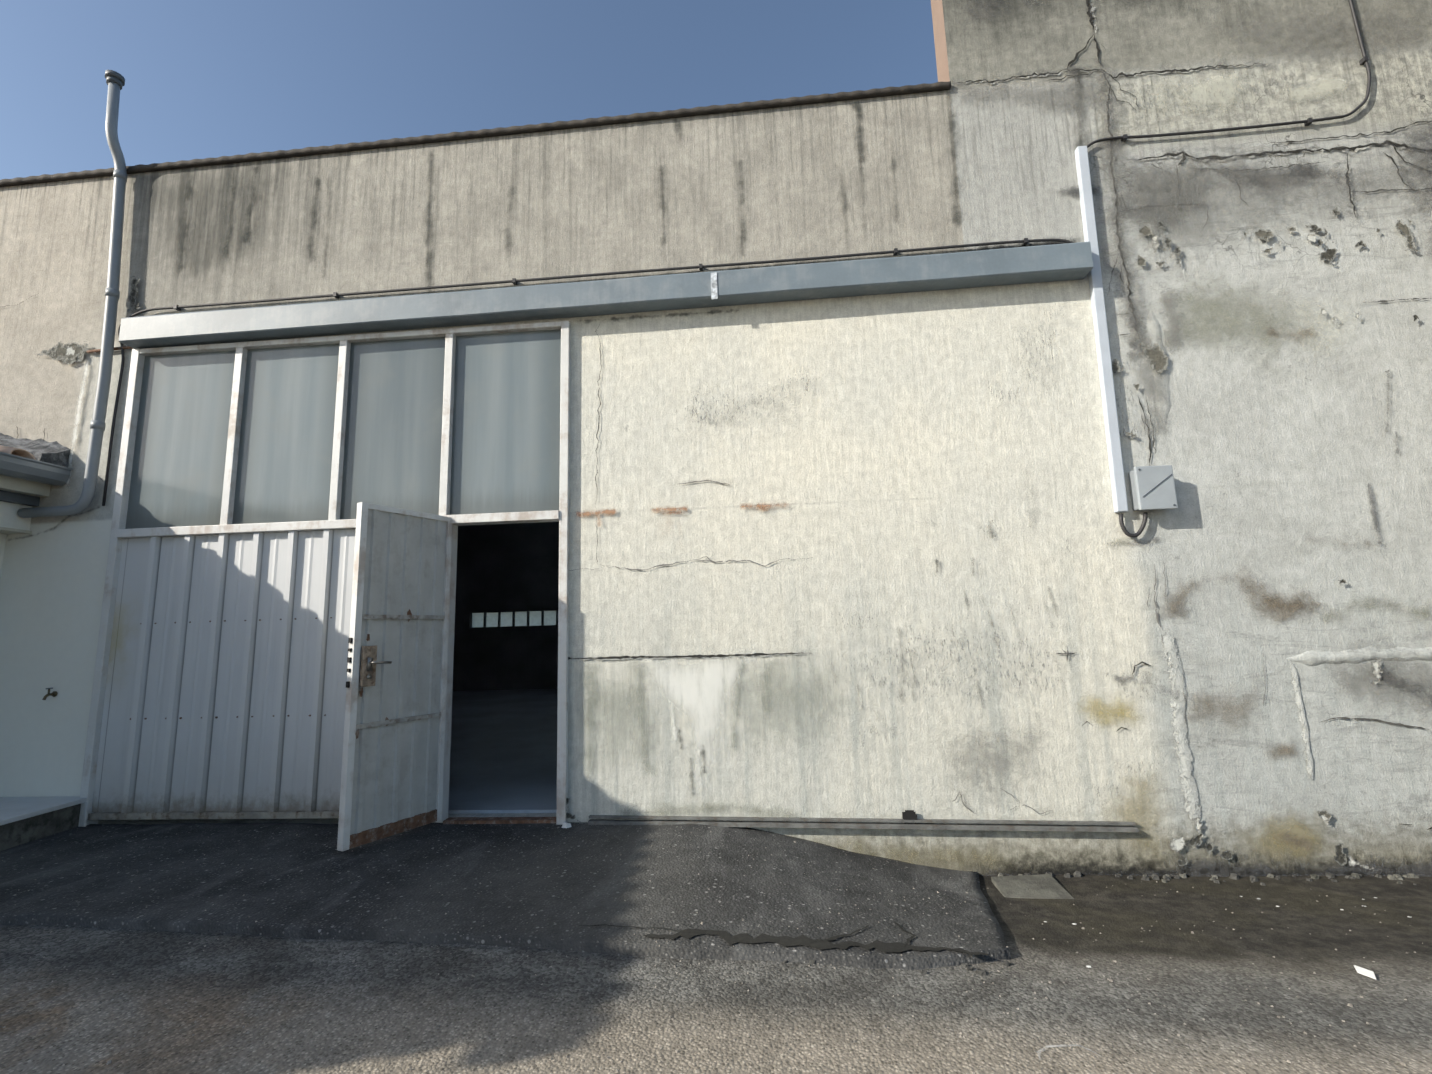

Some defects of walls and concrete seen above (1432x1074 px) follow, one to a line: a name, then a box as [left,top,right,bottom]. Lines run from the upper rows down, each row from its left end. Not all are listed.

leakage [1065,187,1099,196]
crack [952,0,1432,355]
leakage [907,240,1074,256]
spalling [1137,220,1183,267]
spalling [1244,207,1340,265]
spalling [1355,219,1419,253]
spalling [36,339,96,365]
crack [569,324,812,571]
crack [1138,397,1156,466]
corrosion [577,509,616,525]
crack [1132,562,1167,676]
leakage [655,659,742,776]